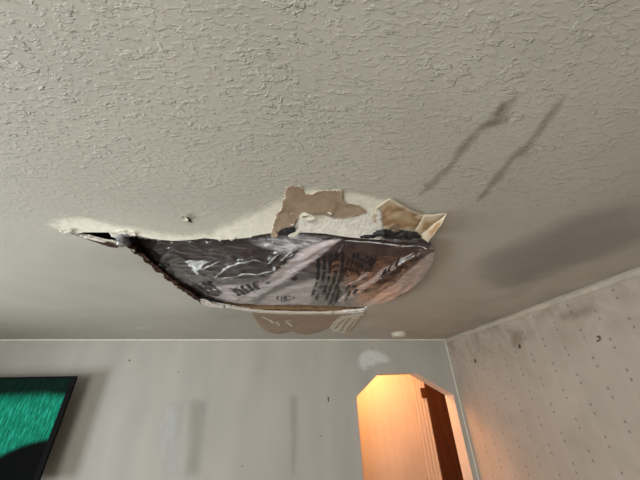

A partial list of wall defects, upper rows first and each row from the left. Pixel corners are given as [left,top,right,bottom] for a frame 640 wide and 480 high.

peeling [50,199,283,243]
peeling [343,192,386,214]
flaking render [162,270,275,311]